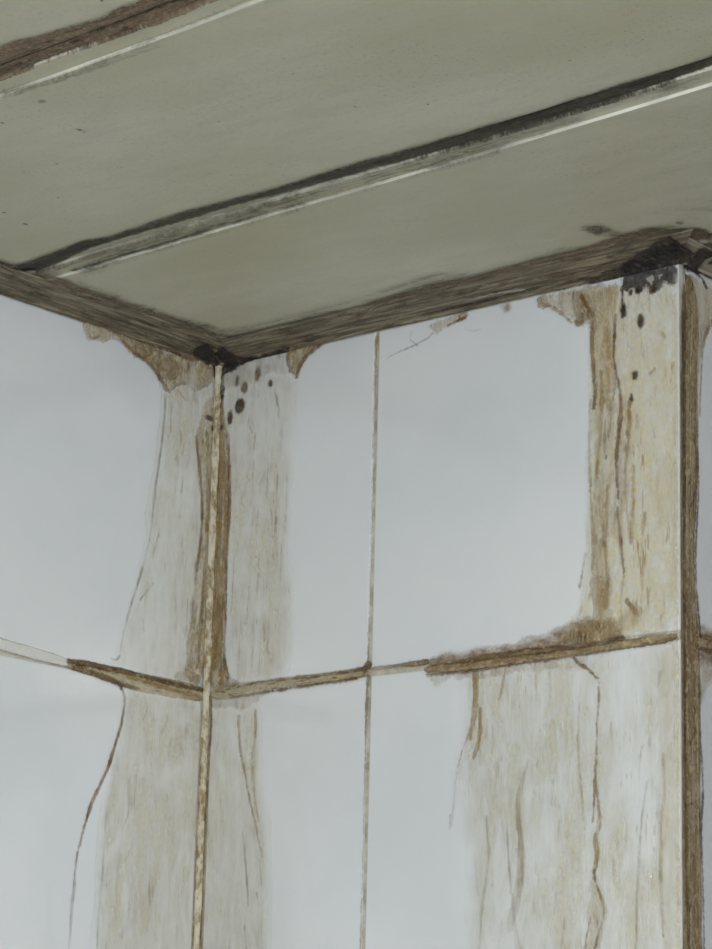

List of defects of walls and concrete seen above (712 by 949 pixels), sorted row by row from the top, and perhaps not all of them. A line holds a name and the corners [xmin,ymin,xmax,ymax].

leakage [14,57,712,273]
leakage [193,343,290,431]
leakage [423,273,577,316]
leakage [585,222,712,949]
leakage [67,659,212,949]
leakage [469,672,482,751]